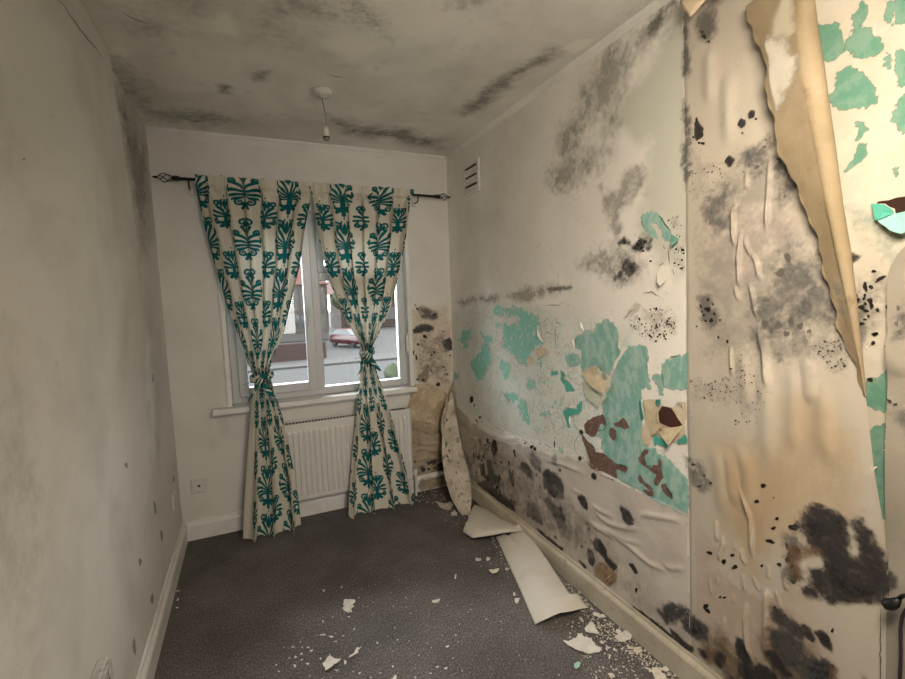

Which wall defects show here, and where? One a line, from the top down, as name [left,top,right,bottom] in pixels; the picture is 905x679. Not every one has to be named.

leakage [338,123,431,144]
leakage [556,0,842,345]
flaking render [815,0,905,537]
leakage [406,294,454,395]
leakage [414,443,459,491]
peeling [437,501,458,516]
leakage [469,437,617,586]
peeling [451,293,689,516]
leakage [620,507,634,526]
leakage [632,335,897,679]